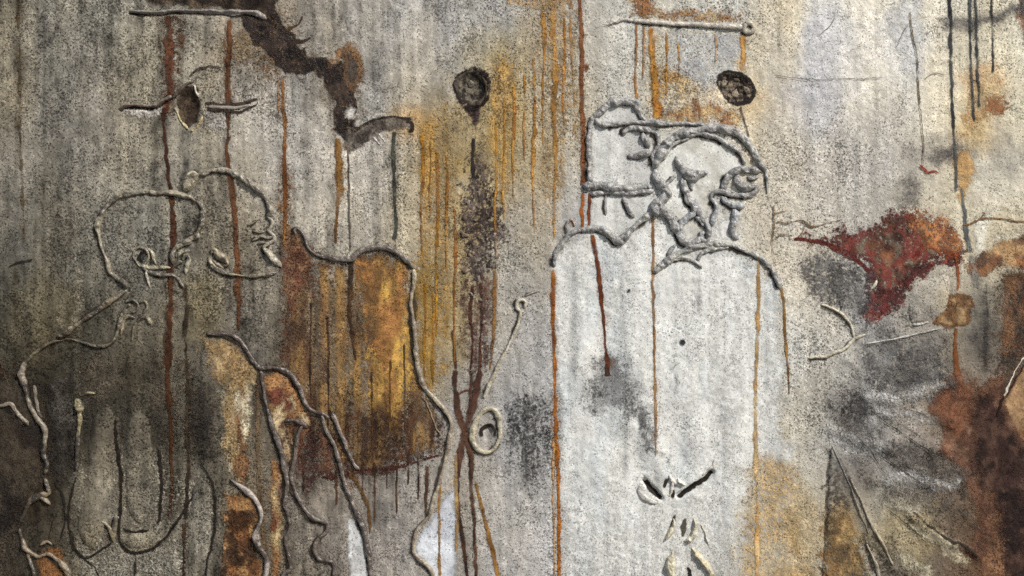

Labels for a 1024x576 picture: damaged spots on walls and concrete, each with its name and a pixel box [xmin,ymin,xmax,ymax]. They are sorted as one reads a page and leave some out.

rust [155,15,191,576]
leakage [148,0,414,239]
rust [204,20,500,576]
spalling [453,66,492,125]
leakage [501,388,563,501]
rust [484,0,610,376]
peeling [661,27,758,136]
rust [728,262,869,576]
rust [794,207,1024,576]
leakage [929,0,1024,370]